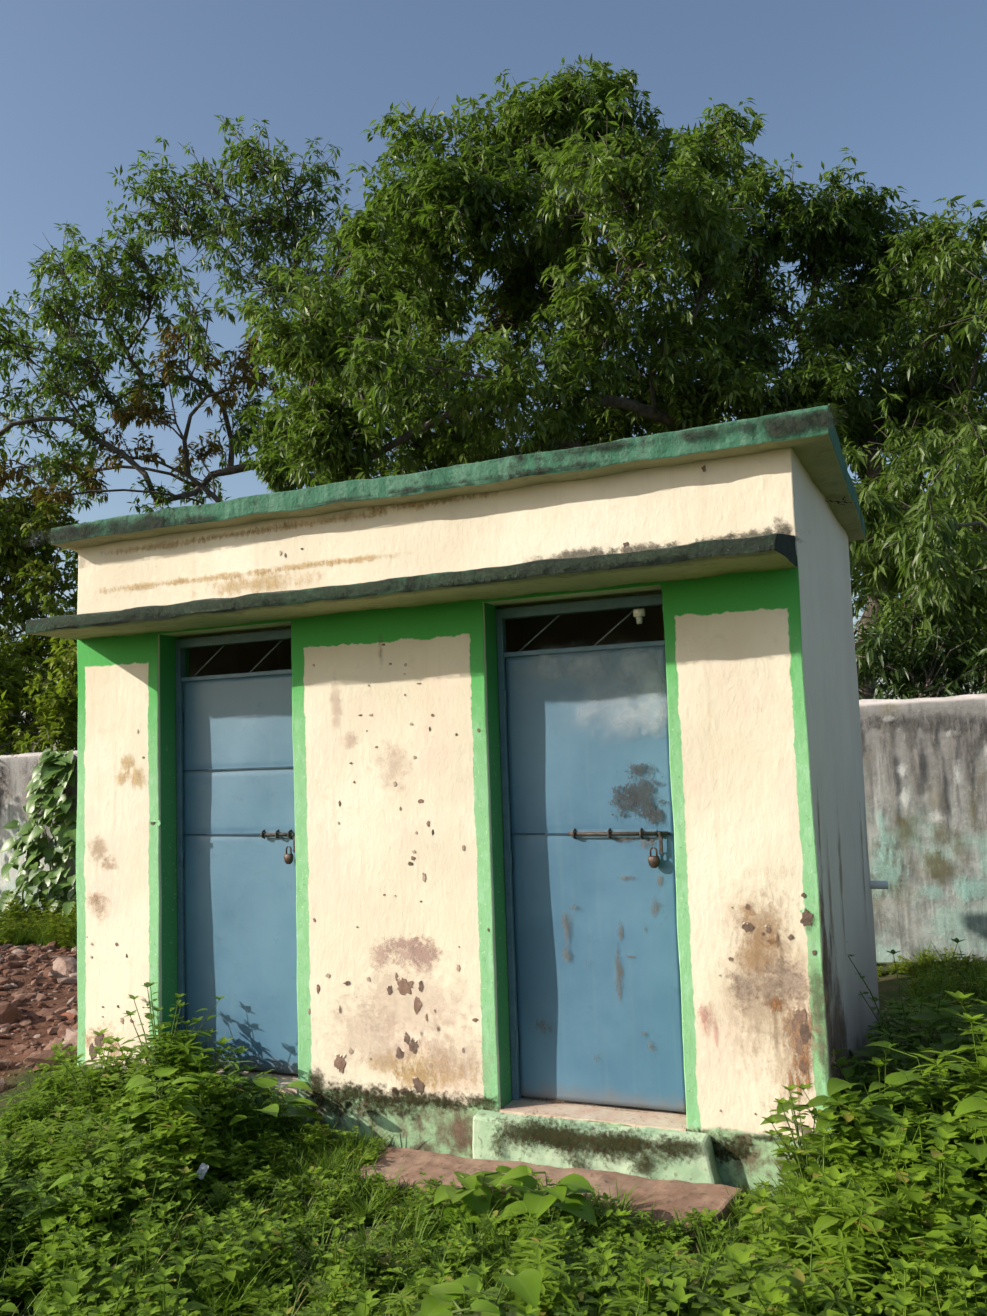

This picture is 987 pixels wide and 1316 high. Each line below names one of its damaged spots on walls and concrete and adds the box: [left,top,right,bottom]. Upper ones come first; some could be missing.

mould [681,408,833,441]
damp [515,440,628,475]
damp [38,519,800,629]
damp [0,762,78,826]
damp [861,713,987,820]
damp [444,1113,473,1144]